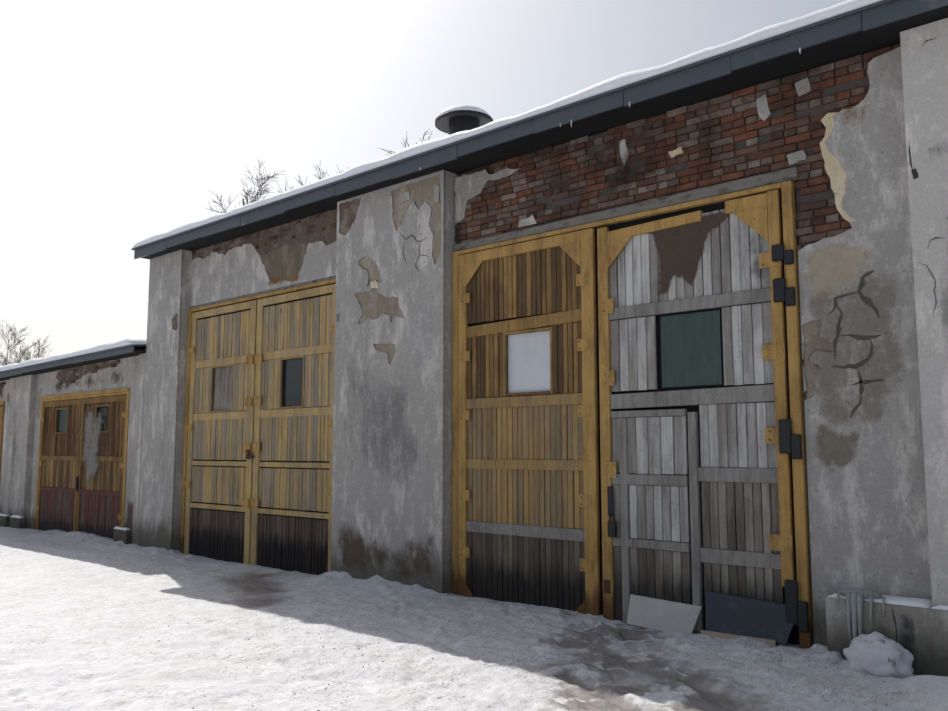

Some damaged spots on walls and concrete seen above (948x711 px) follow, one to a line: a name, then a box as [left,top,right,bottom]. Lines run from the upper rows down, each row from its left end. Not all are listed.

spalling [454,43,901,252]
spalling [192,198,361,284]
spalling [356,257,404,324]
spalling [392,175,442,264]
crack [917,237,941,313]
spalling [374,343,396,364]
crack [829,270,885,419]